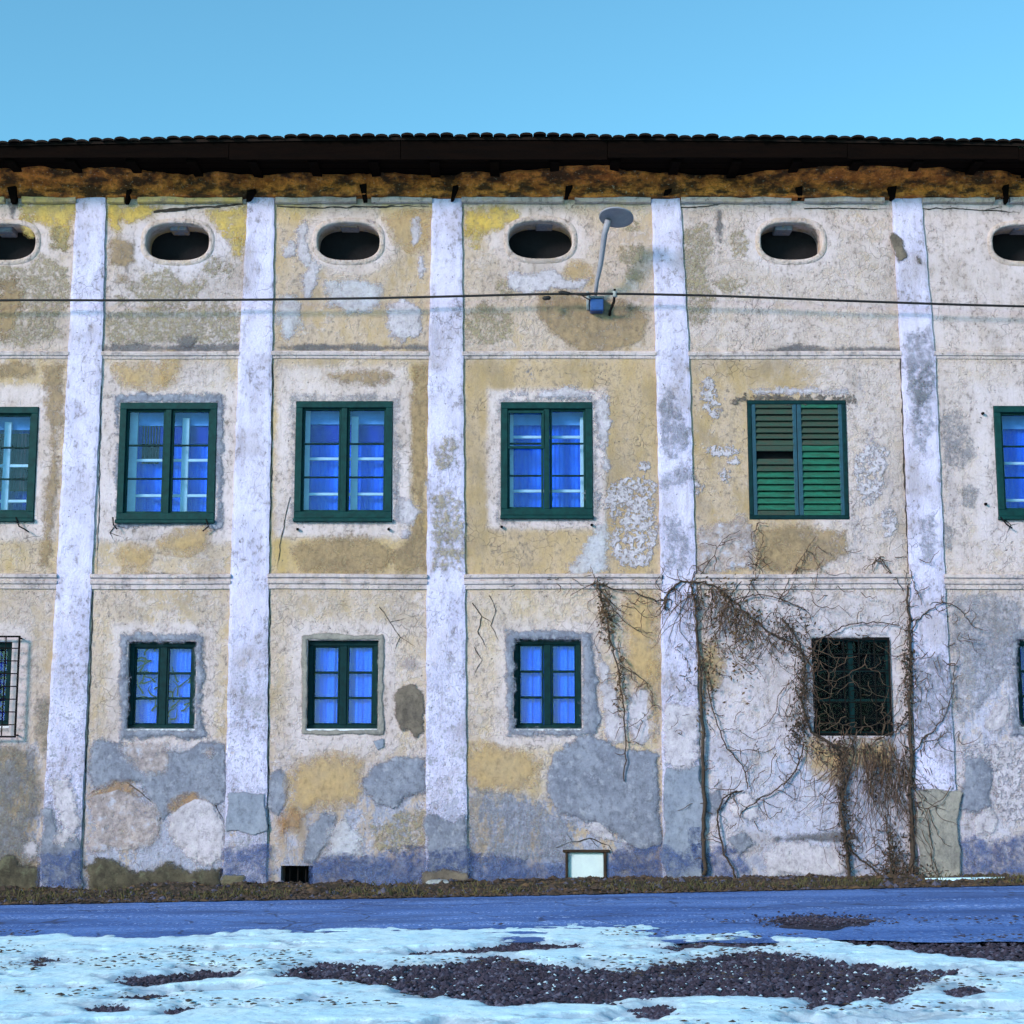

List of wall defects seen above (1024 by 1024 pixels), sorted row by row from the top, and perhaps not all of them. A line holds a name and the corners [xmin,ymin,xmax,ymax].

peeling [411,216,426,278]
spalling [890,233,922,264]
peeling [276,221,422,344]
peeling [699,377,857,421]
peeling [509,386,659,574]
peeling [705,444,742,484]
peeling [853,439,898,537]
crack [472,595,499,672]
spalling [394,684,425,738]
flaking render [122,741,169,774]
peeling [326,810,425,860]
peeling [585,822,628,844]